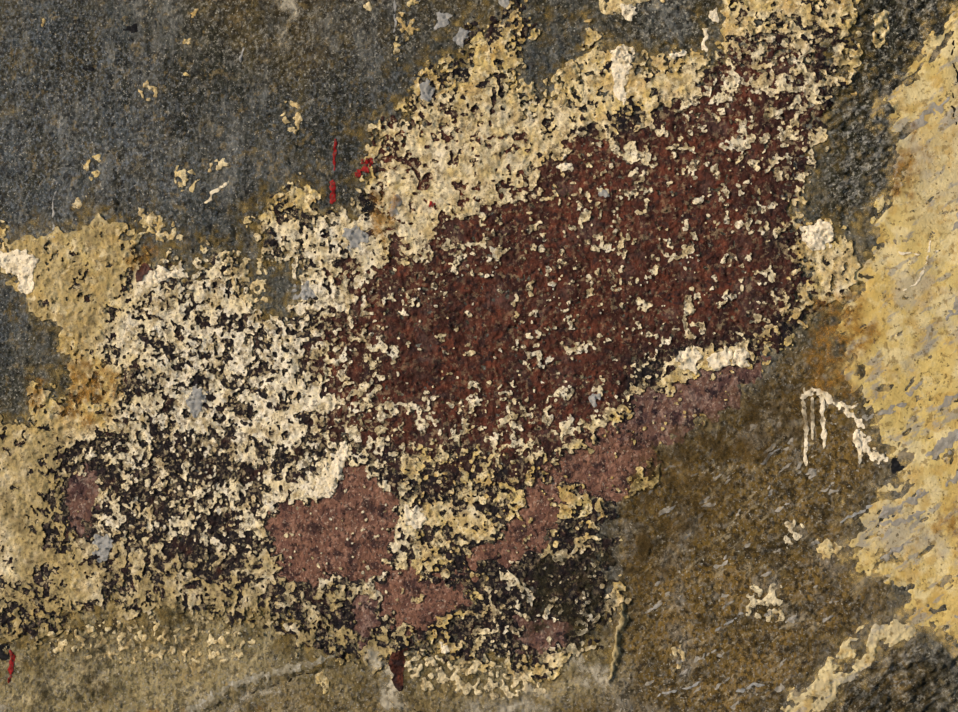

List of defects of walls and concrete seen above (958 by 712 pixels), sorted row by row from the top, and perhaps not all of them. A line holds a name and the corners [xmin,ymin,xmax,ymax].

peeling [620,3,637,21]
peeling [708,8,719,23]
peeling [701,28,709,52]
peeling [394,97,410,115]
peeling [780,5,958,712]
peeling [628,464,660,496]
peeling [404,504,427,529]
spalling [465,478,566,572]
spalling [375,563,473,631]
spalling [350,594,381,639]
spalling [512,615,573,654]